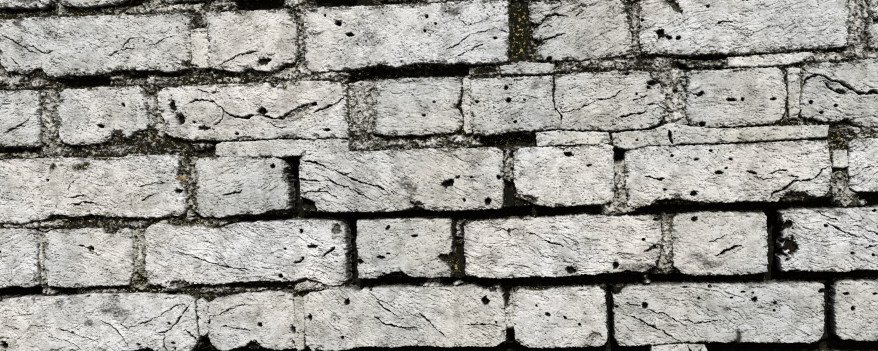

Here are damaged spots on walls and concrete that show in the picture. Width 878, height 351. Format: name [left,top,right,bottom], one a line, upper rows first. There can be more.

crack [552,77,666,120]